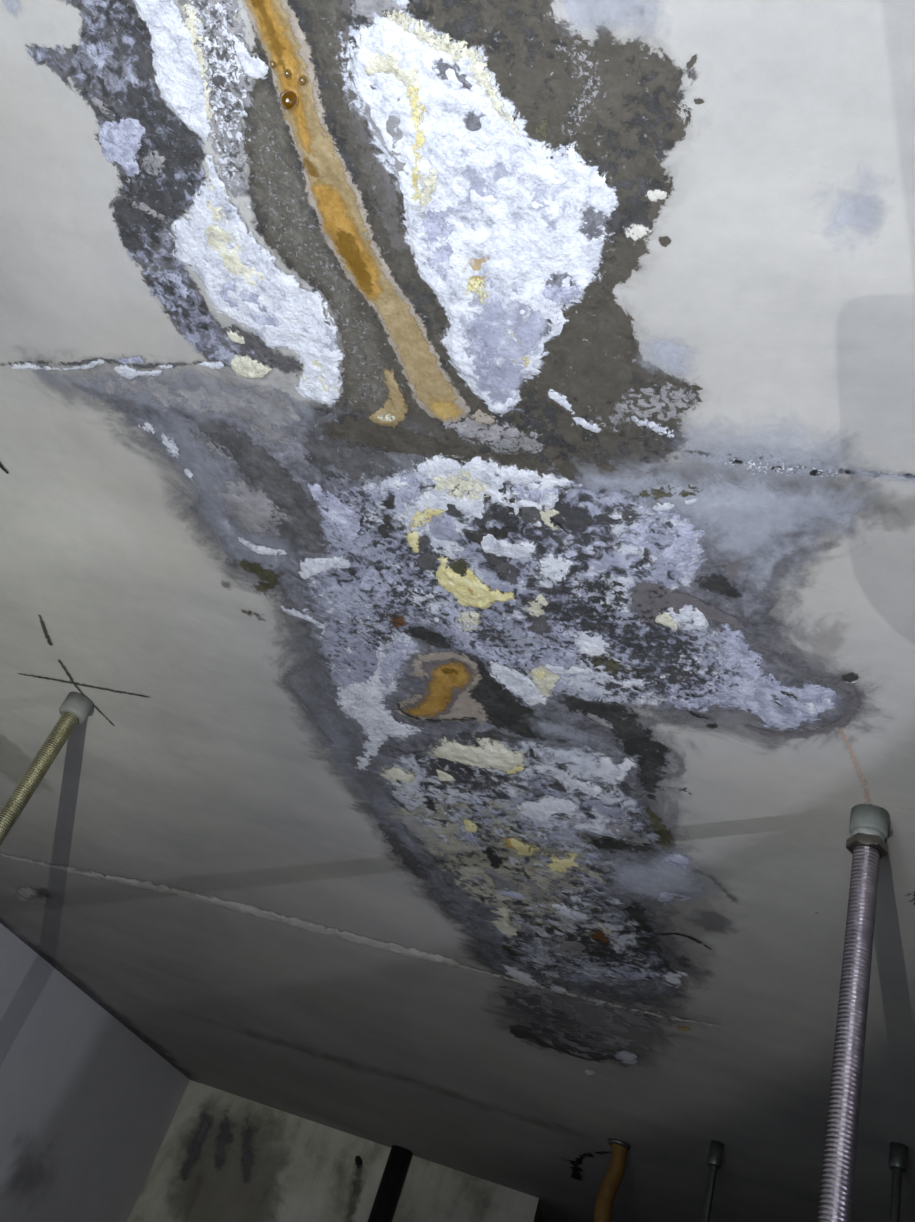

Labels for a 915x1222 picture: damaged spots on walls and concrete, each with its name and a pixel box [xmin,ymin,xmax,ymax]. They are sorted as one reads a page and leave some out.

water stain [686,55,697,80]
rust [242,0,471,421]
crack [0,356,228,379]
crack [684,450,915,481]
rust [395,626,491,724]
spalling [841,672,859,683]
water stain [180,1112,253,1182]